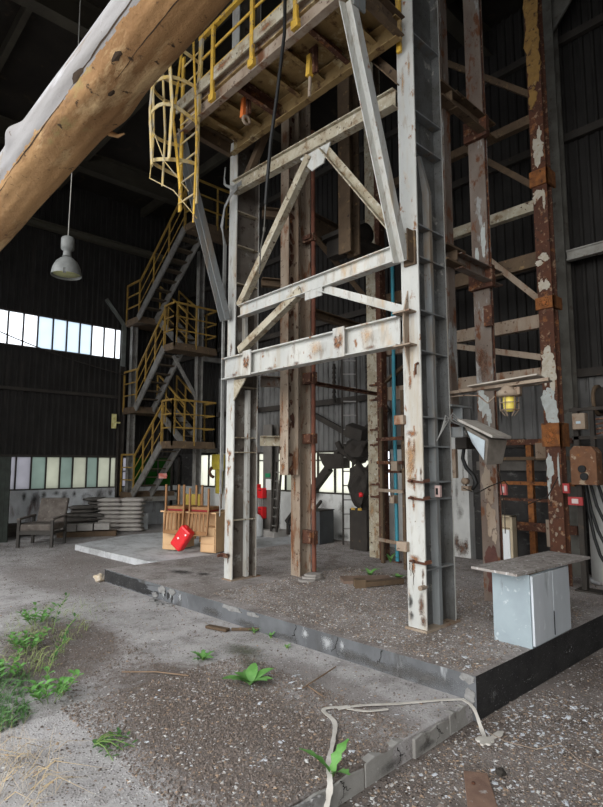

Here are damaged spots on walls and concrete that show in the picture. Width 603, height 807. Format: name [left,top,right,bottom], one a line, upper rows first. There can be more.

peeling [538,279,550,292]
peeling [540,345,559,423]
corrosion [408,431,422,508]
peeling [16,585,453,807]
peeling [352,655,603,807]